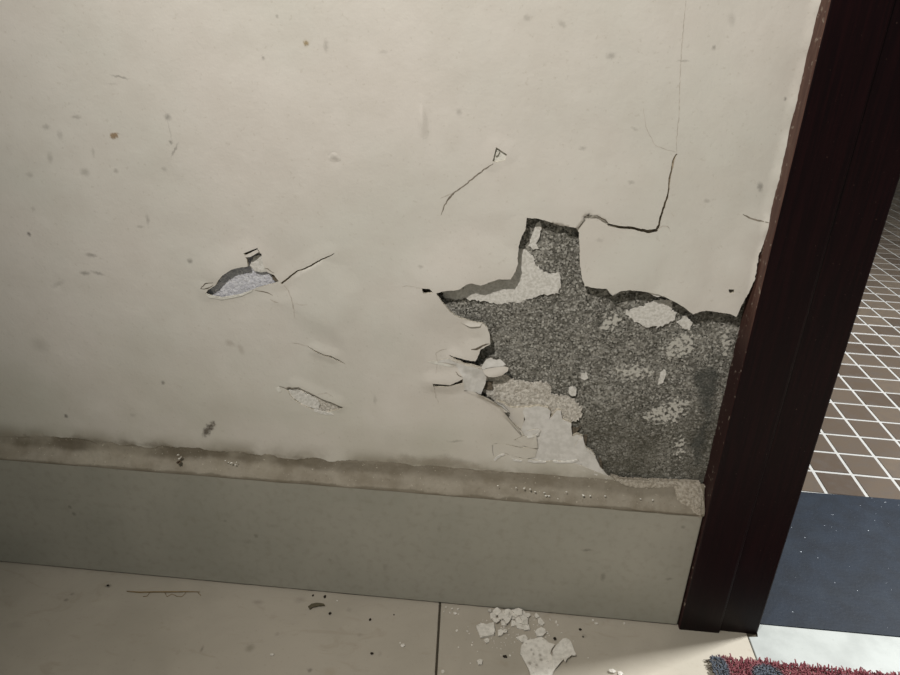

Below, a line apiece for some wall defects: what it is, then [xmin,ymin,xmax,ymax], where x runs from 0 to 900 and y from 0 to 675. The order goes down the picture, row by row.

crack [578,4,686,233]
crack [441,164,493,214]
spalling [200,248,278,300]
crack [256,254,333,317]
spalling [427,218,746,518]
peeling [276,386,341,415]